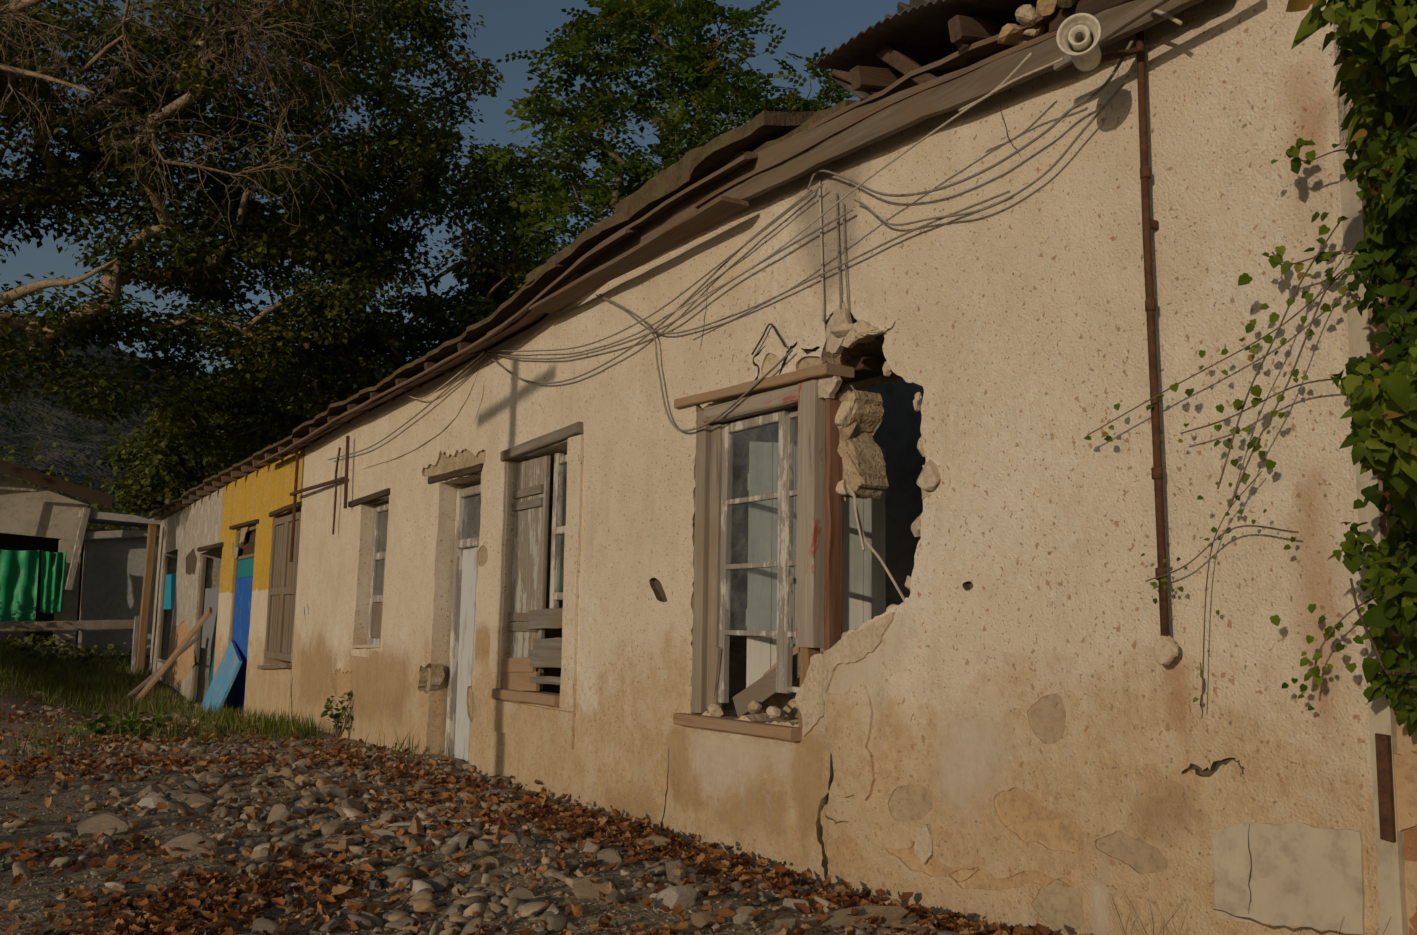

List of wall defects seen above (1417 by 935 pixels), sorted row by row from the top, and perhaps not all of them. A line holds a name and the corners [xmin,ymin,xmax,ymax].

crack [1199,663,1207,719]
spalling [1027,693,1066,744]
crack [1181,758,1245,777]
spalling [885,785,1075,890]
spalling [1095,831,1168,874]